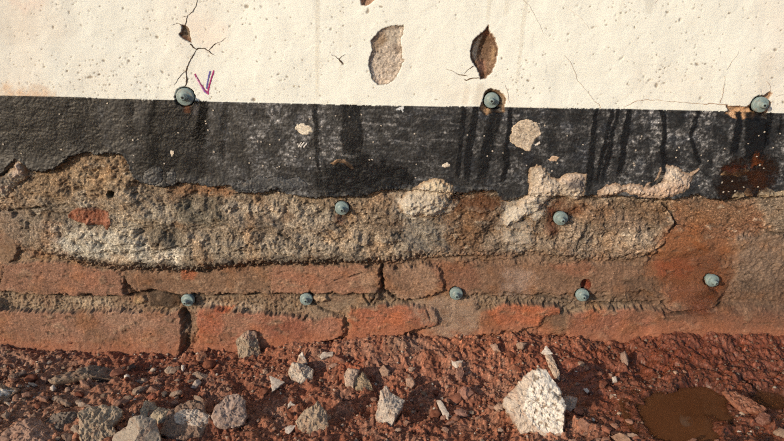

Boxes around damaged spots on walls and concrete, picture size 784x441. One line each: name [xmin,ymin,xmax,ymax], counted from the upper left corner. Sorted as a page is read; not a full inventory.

crack [174,38,225,88]
flaking render [369,25,404,84]
flaking render [470,27,498,79]
crack [627,52,739,106]
water stain [145,100,208,172]
water stain [312,104,413,196]
water stain [455,106,513,183]
peeling [509,119,542,151]
water stain [586,108,632,184]
water stain [648,110,668,187]
rust [718,111,779,199]
flaking render [68,207,111,230]